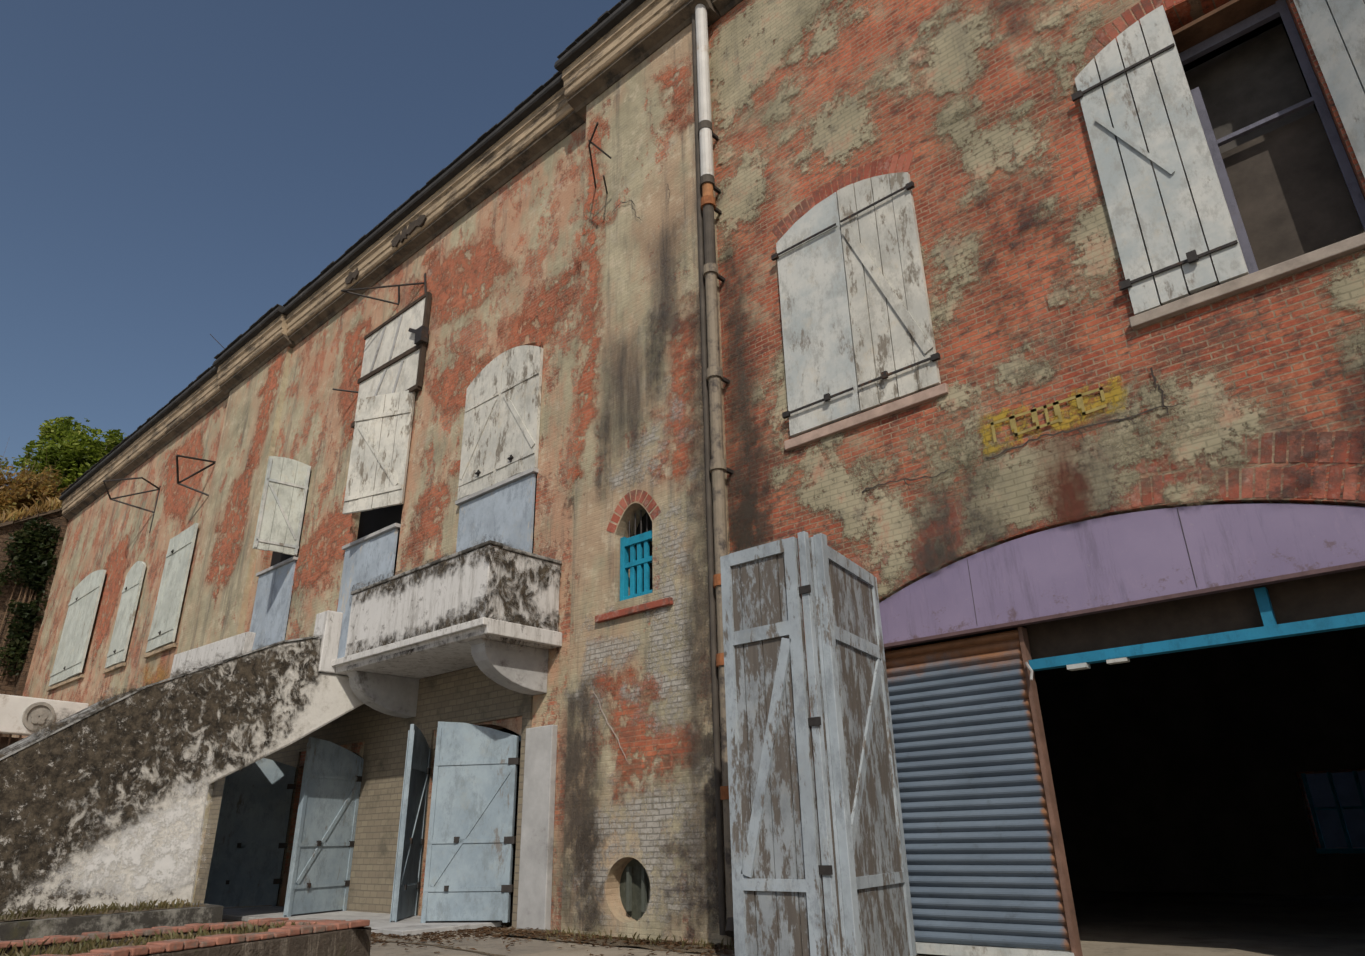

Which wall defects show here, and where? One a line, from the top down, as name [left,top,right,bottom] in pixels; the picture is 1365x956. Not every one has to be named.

mould [347,538,562,667]
flaking render [430,113,617,487]
water stain [604,346,640,430]
peeling [563,296,711,922]
water stain [657,235,764,923]
flaking render [709,0,1052,264]
crack [862,468,952,493]
flaking render [748,332,1268,598]
flaking render [1046,190,1120,313]
crack [986,367,1184,459]
mould [0,635,321,903]
water stain [559,683,599,896]